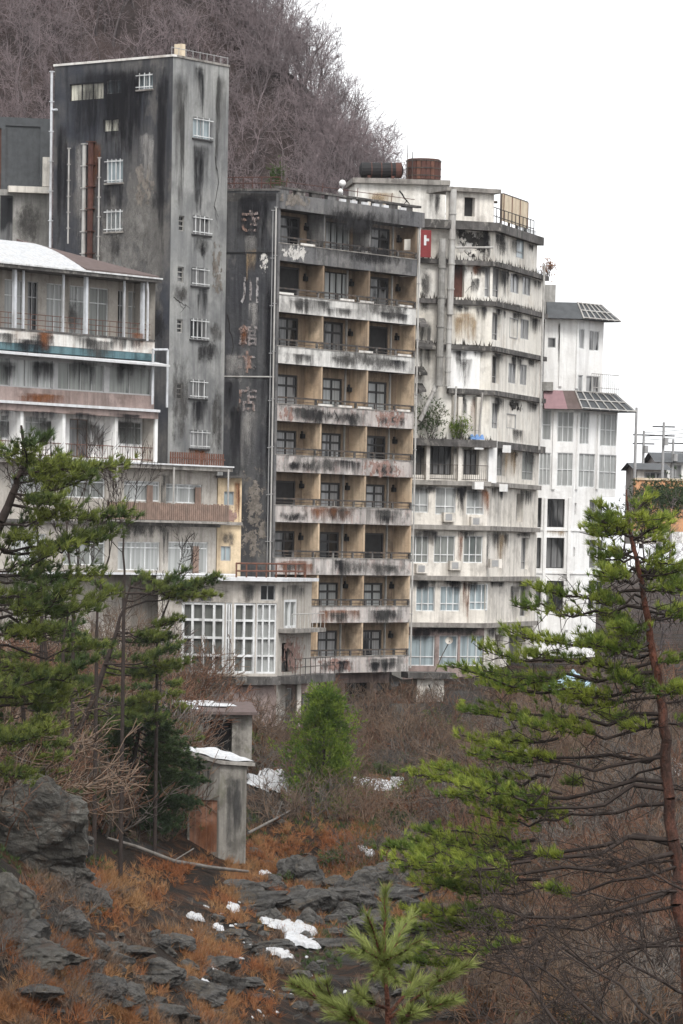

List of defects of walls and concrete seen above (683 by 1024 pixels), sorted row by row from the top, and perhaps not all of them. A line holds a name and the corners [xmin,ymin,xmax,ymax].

water stain [58,132,82,197]
water stain [143,80,187,208]
peeling [282,244,306,262]
water stain [455,305,540,329]
spalling [229,467,267,558]